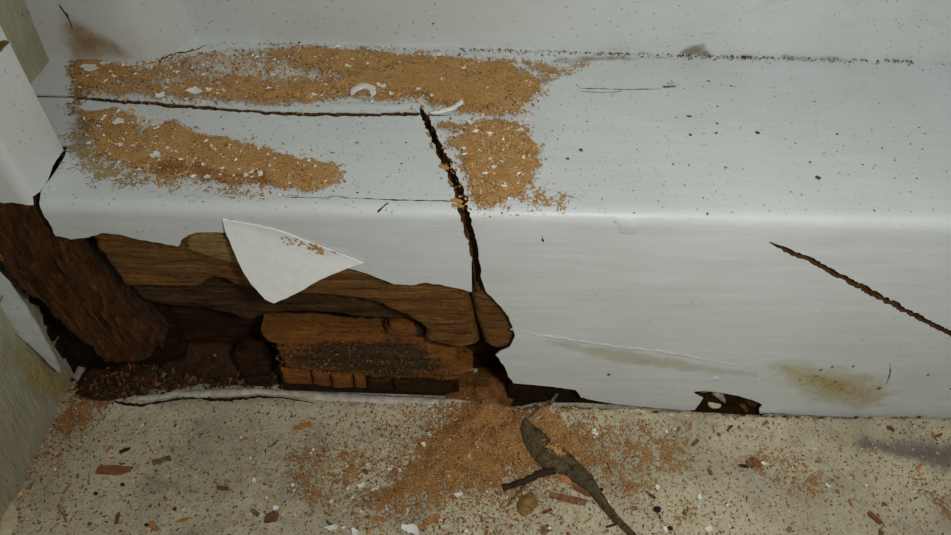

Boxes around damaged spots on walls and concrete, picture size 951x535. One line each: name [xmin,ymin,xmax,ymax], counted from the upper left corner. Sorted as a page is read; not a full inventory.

crack [291,195,451,203]
peeling [0,272,61,373]
peeling [222,219,363,303]
crack [770,242,951,337]
spalling [689,391,768,415]